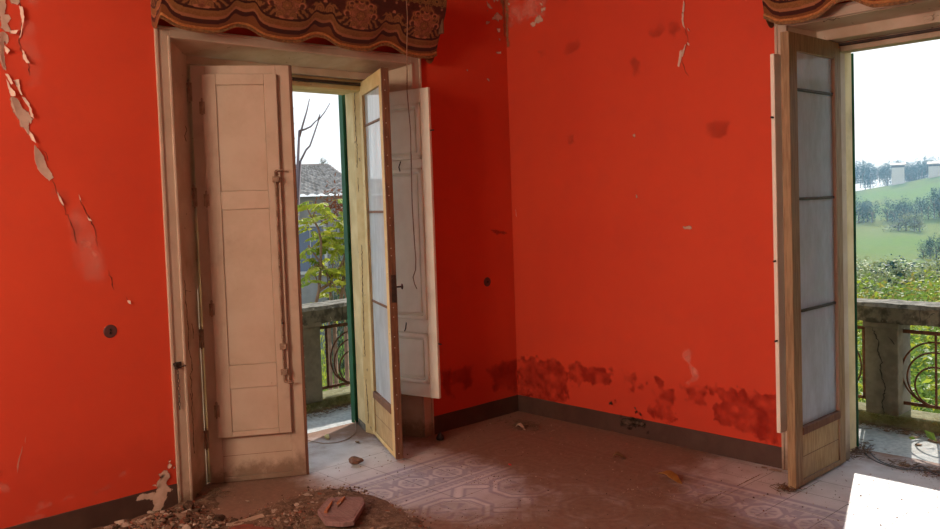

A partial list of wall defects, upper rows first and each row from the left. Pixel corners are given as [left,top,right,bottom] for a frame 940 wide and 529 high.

crack [0,0,98,247]
crack [872,328,894,415]
peeling [136,460,175,512]